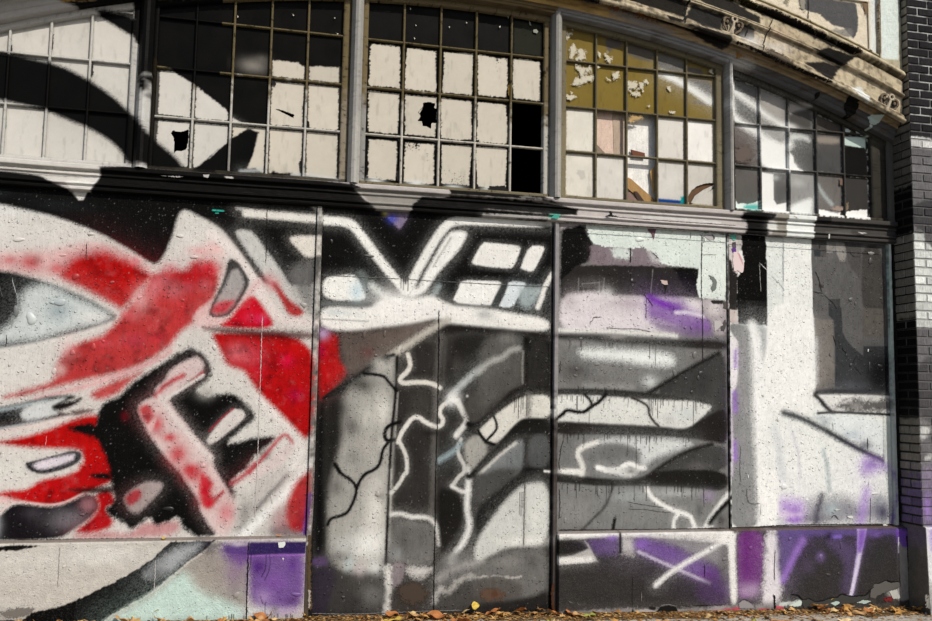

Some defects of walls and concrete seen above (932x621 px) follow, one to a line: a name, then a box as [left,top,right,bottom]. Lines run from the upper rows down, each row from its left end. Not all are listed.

peeling [566,29,649,100]
crack [312,311,460,615]